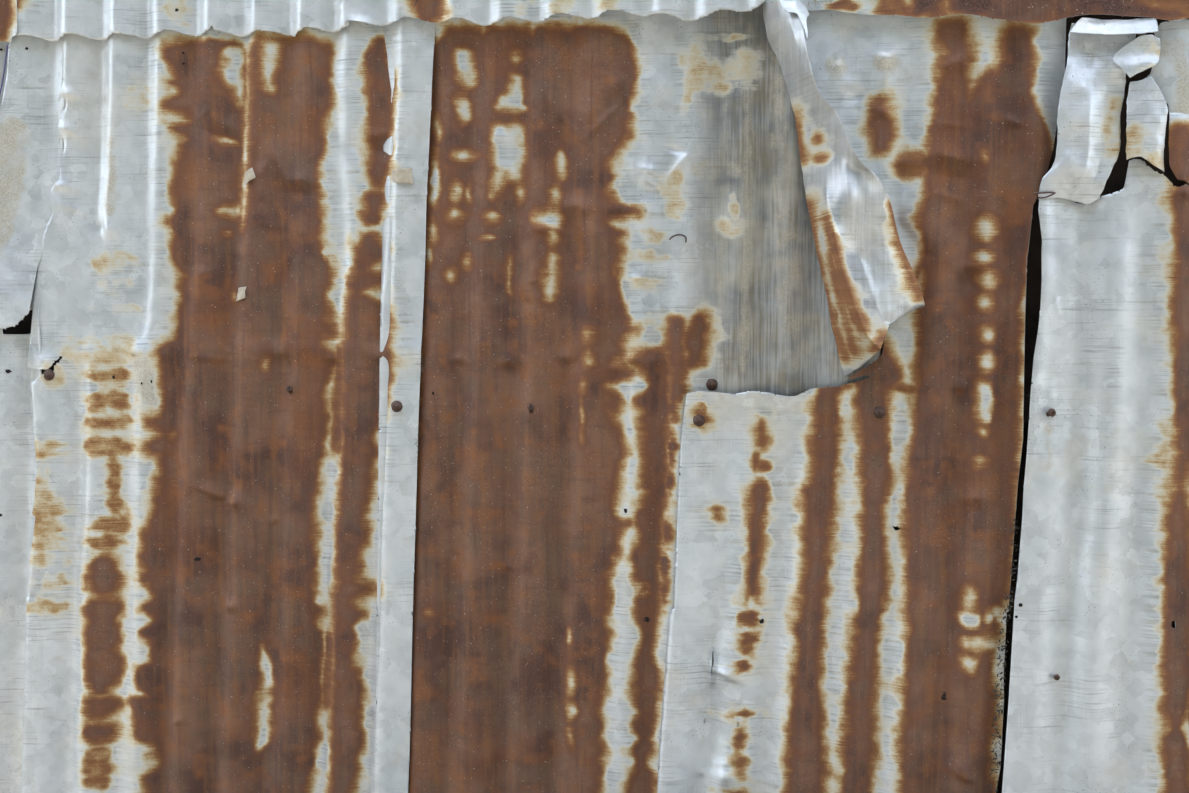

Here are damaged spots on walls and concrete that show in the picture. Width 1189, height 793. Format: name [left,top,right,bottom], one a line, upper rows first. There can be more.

rust [26,0,725,793]
rust [668,29,749,129]
peeling [762,0,925,378]
rust [685,0,1060,793]
rust [1092,0,1189,21]
rust [1134,166,1189,793]